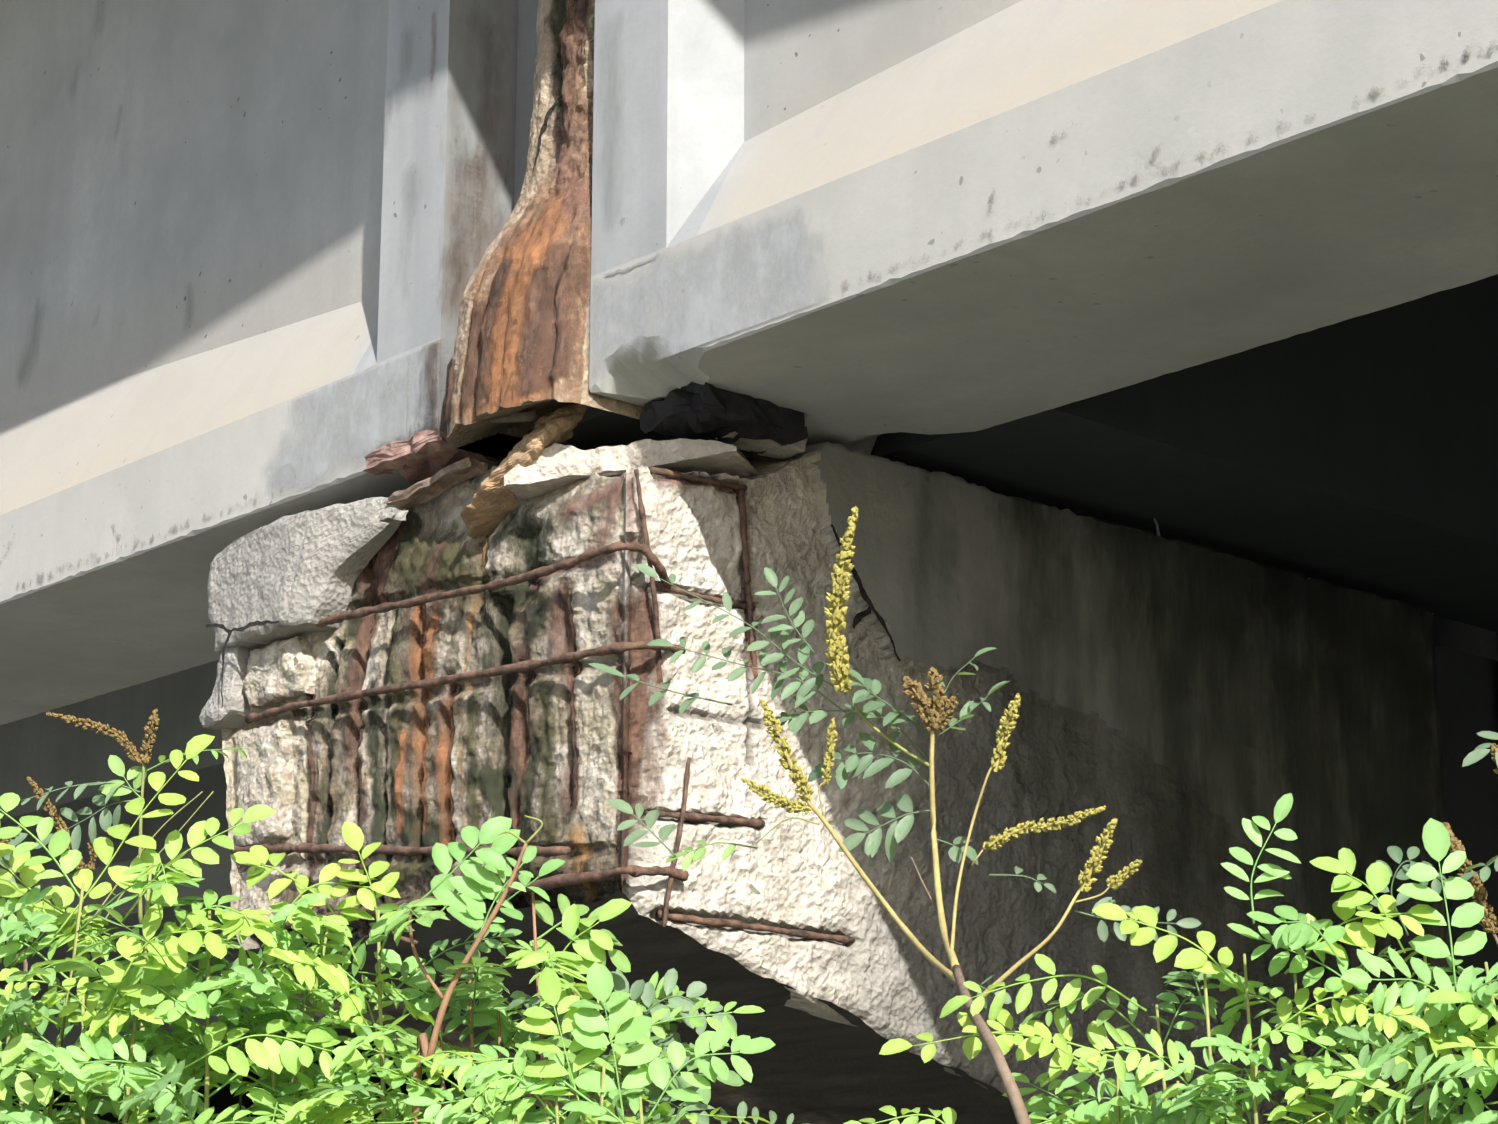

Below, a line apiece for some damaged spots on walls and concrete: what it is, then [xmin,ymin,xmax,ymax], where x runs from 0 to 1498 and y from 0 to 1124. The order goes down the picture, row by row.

corrosion [427,0,593,430]
leakage [281,883,327,916]
corrosion [304,694,320,895]
leakage [349,925,367,940]
corrosion [343,525,402,830]
corrosion [394,538,474,875]
leakage [292,473,626,927]
corrosion [510,644,536,847]
corrosion [513,866,542,907]
corrosion [531,570,592,896]
corrosion [609,586,668,890]
spalling [199,431,1384,1124]